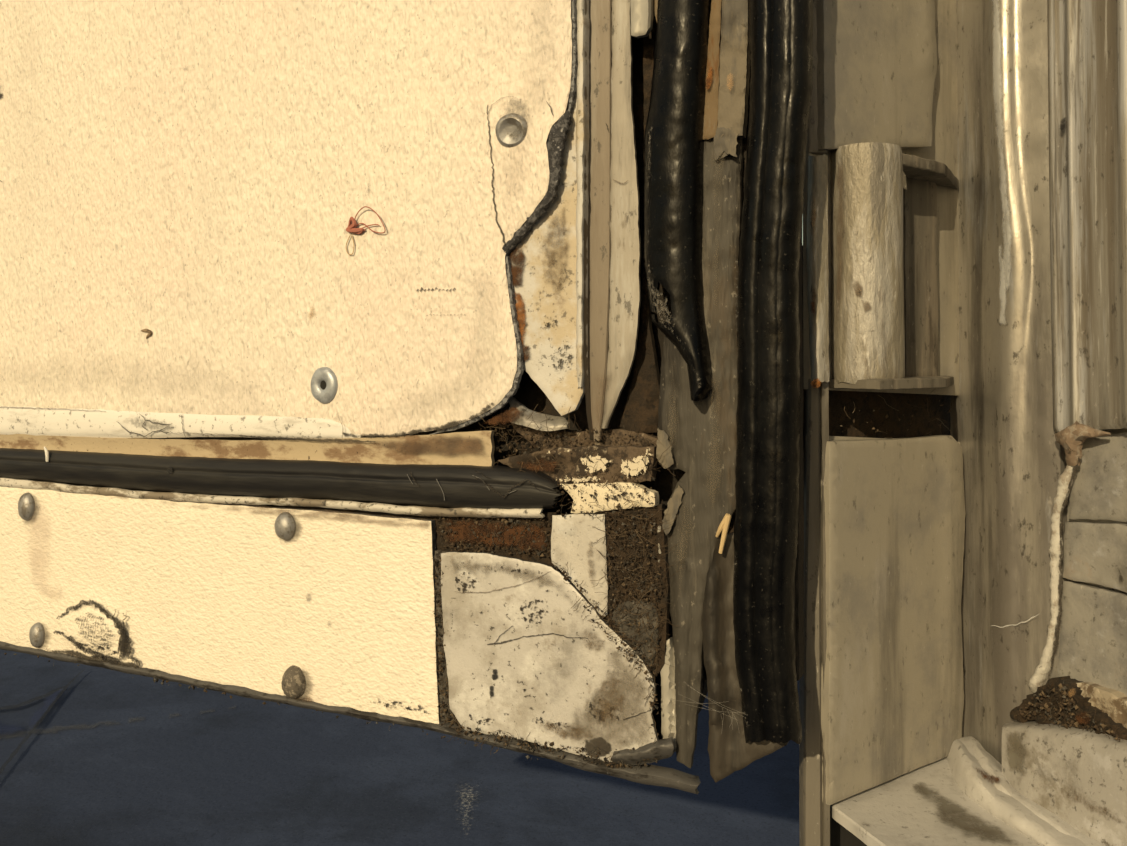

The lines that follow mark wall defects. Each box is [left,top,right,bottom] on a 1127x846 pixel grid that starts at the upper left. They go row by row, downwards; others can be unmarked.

crack [487,105,506,246]
water stain [546,216,567,289]
corrosion [509,249,529,361]
peeling [547,448,653,484]
water stain [914,783,1012,842]